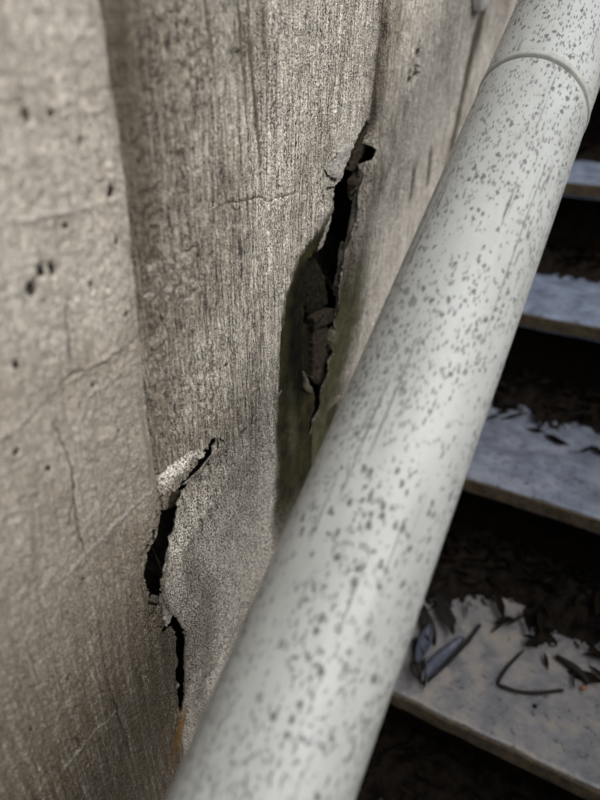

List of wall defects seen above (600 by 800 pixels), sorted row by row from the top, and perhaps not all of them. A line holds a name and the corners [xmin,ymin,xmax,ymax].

leakage [287,263,306,466]
leakage [310,264,363,469]
crack [300,120,374,443]
spalling [156,450,206,495]
crack [143,437,229,713]